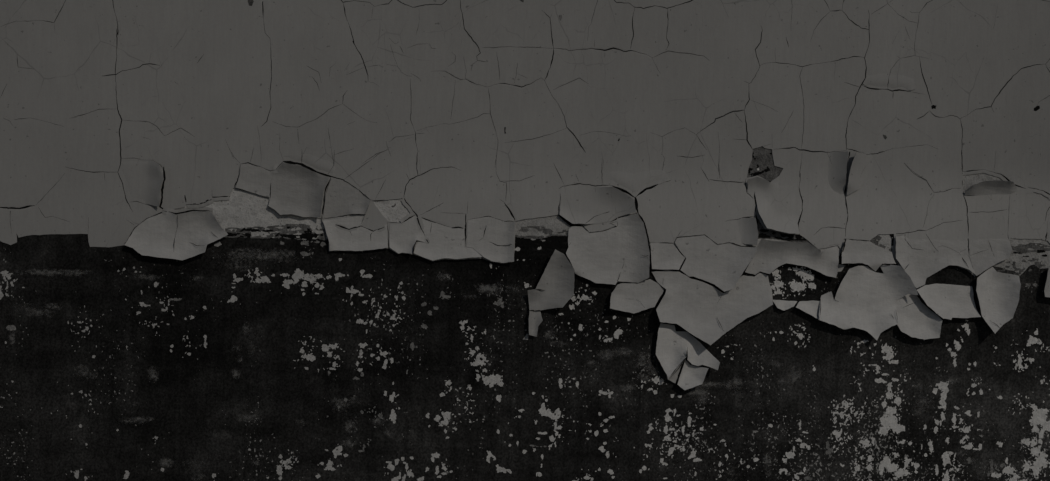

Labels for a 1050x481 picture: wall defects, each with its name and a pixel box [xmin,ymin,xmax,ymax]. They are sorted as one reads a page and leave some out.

spalling [0,259,25,299]
crack [0,0,1050,329]
peeling [117,146,1050,481]